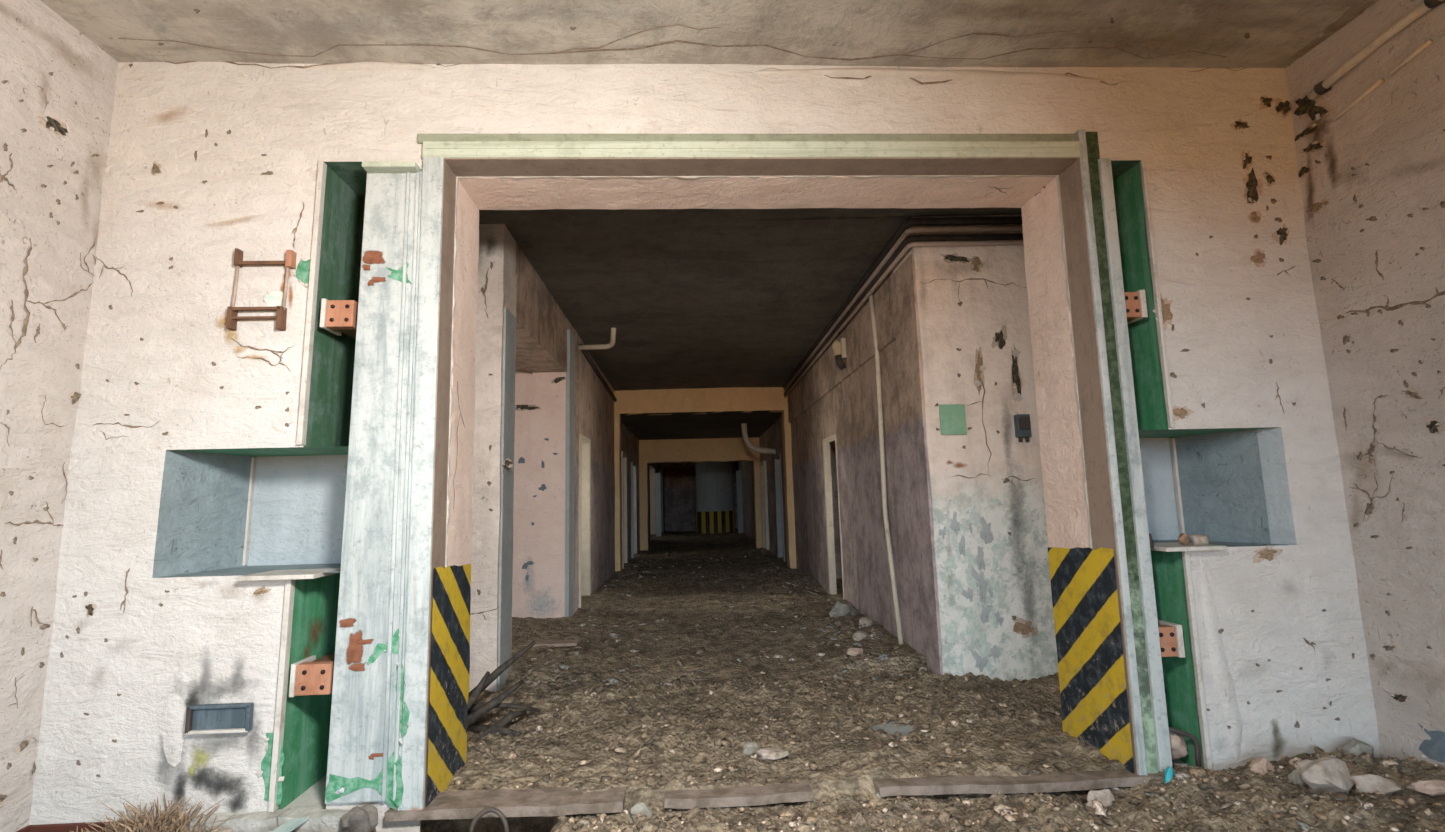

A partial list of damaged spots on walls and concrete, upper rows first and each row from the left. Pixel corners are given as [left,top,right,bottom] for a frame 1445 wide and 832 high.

crack [118,38,339,68]
crack [405,24,1248,85]
spalling [1230,119,1250,131]
spalling [1259,92,1335,178]
spalling [1241,150,1290,268]
crack [0,238,133,369]
crack [1331,250,1445,314]
crack [231,338,293,371]
rust [339,618,373,671]
water stain [187,669,240,706]
peeling [1418,723,1445,762]
water stain [161,755,243,811]